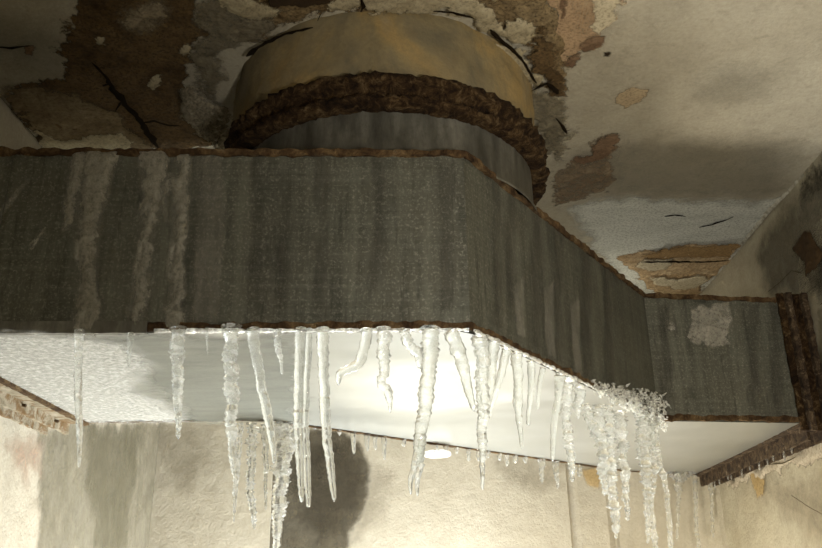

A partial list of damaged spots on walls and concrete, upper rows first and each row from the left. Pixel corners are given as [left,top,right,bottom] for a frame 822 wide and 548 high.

crack [91,62,179,148]
flaking render [1,0,627,206]
flaking render [616,243,741,295]
damp [758,167,822,294]
rust [0,376,89,426]
damp [38,422,160,548]